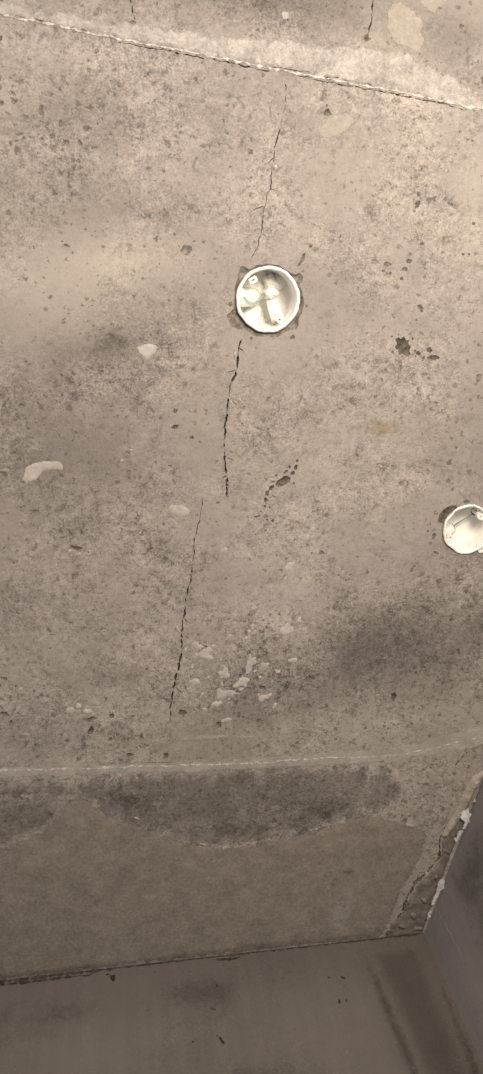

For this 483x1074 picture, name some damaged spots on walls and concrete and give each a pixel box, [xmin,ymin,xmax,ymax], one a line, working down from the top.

crack [251,84,287,258]
crack [169,340,246,720]
peeling [0,798,464,982]